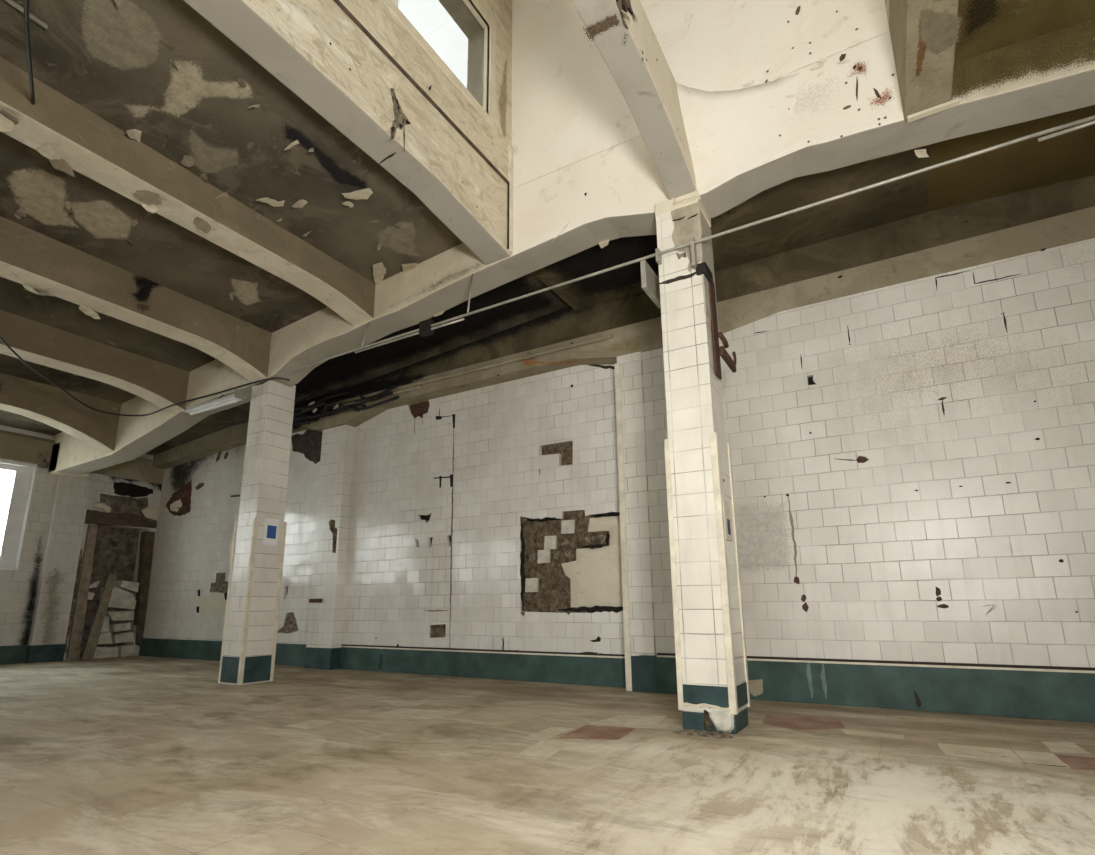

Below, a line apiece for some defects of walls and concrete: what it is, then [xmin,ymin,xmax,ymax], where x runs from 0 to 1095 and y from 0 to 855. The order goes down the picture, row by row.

spalling [616,0,640,29]
leakage [917,0,1095,108]
peeling [75,0,260,181]
peeling [0,109,19,132]
spalling [390,88,411,140]
peeling [4,144,162,244]
peeling [256,198,308,222]
peeling [342,188,373,208]
peeling [542,442,573,466]
flaking render [91,493,156,520]
peeling [520,510,623,616]
spalling [277,612,298,634]